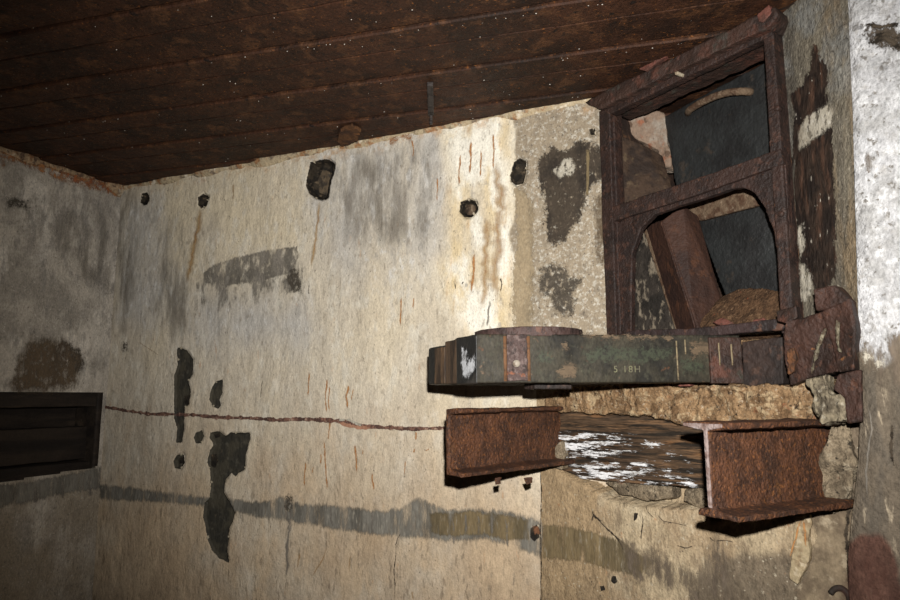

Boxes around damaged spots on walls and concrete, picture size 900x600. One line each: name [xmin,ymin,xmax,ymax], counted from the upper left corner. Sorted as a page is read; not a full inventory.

damp [798,105,834,149]
hole [306,159,336,200]
rust [471,135,502,293]
damp [537,138,604,263]
rust [188,215,200,275]
efflorescence [799,264,812,302]
damp [12,339,84,394]
spalling [174,347,194,469]
crack [105,381,446,431]
spalling [194,430,250,562]
damp [229,497,749,600]